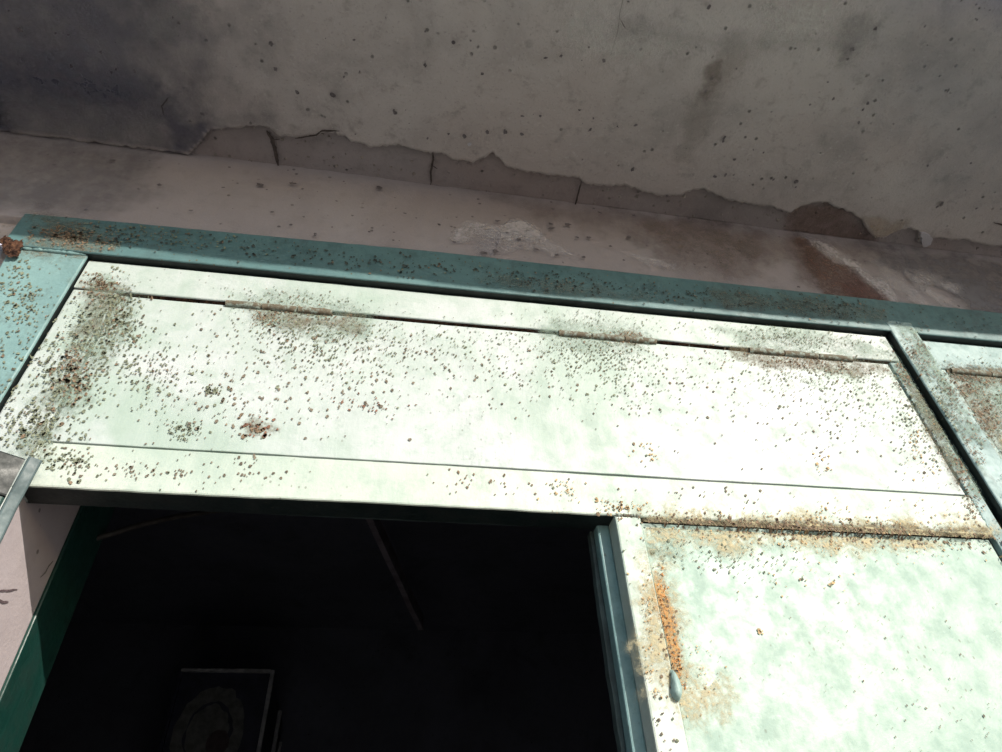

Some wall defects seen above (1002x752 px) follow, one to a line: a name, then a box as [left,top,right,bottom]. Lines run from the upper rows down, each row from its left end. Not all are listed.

spalling [191,125,1002,267]
water stain [807,238,896,302]
corrosion [0,215,1002,752]